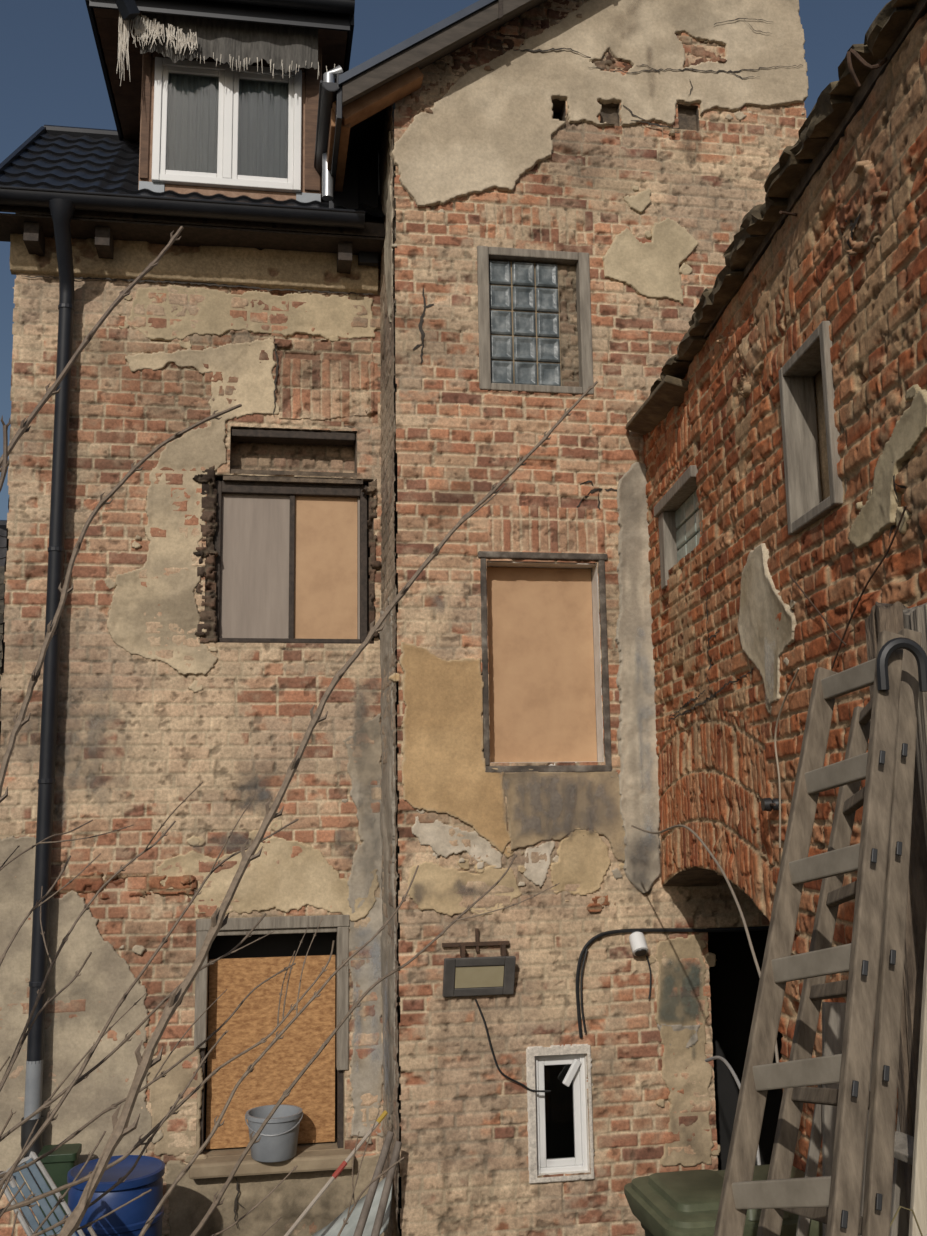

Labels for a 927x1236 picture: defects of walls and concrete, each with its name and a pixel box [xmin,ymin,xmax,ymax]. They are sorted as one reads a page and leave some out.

crack [623,105,679,129]
crack [514,48,801,94]
crack [714,18,771,33]
crack [413,288,434,364]
flaking render [103,0,809,715]
flaking render [848,384,927,549]
flaking render [41,479,626,1236]
flaking render [0,835,36,1192]